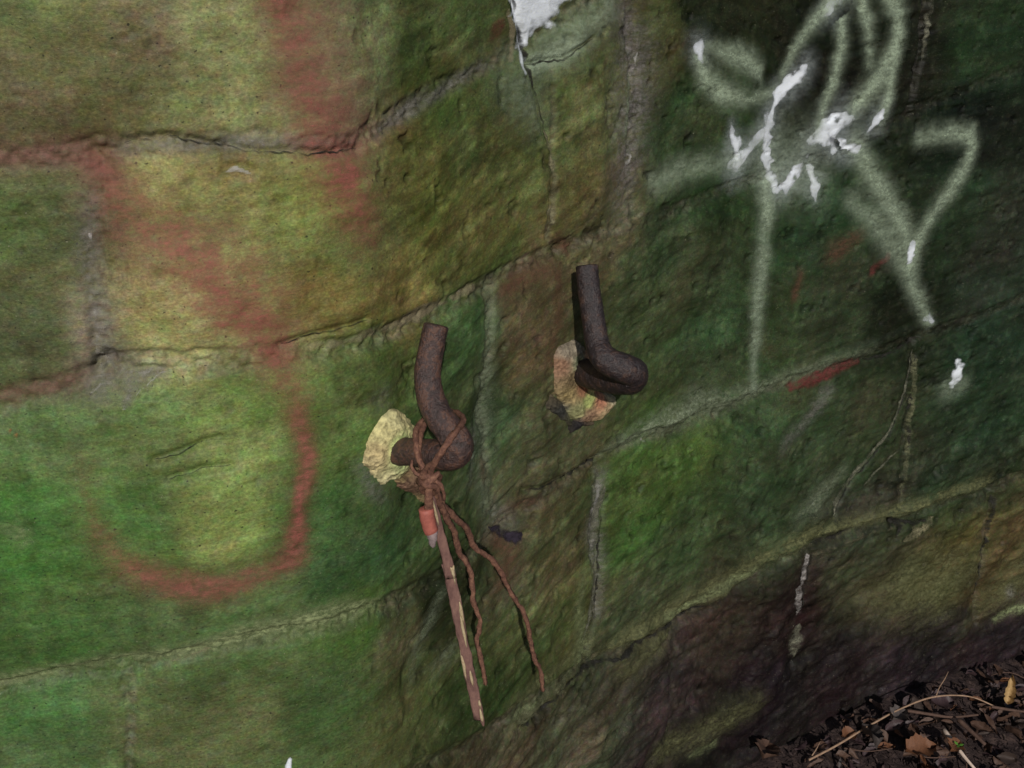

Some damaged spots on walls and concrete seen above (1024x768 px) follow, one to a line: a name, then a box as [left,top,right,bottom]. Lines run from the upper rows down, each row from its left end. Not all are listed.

crack [512,0,593,234]